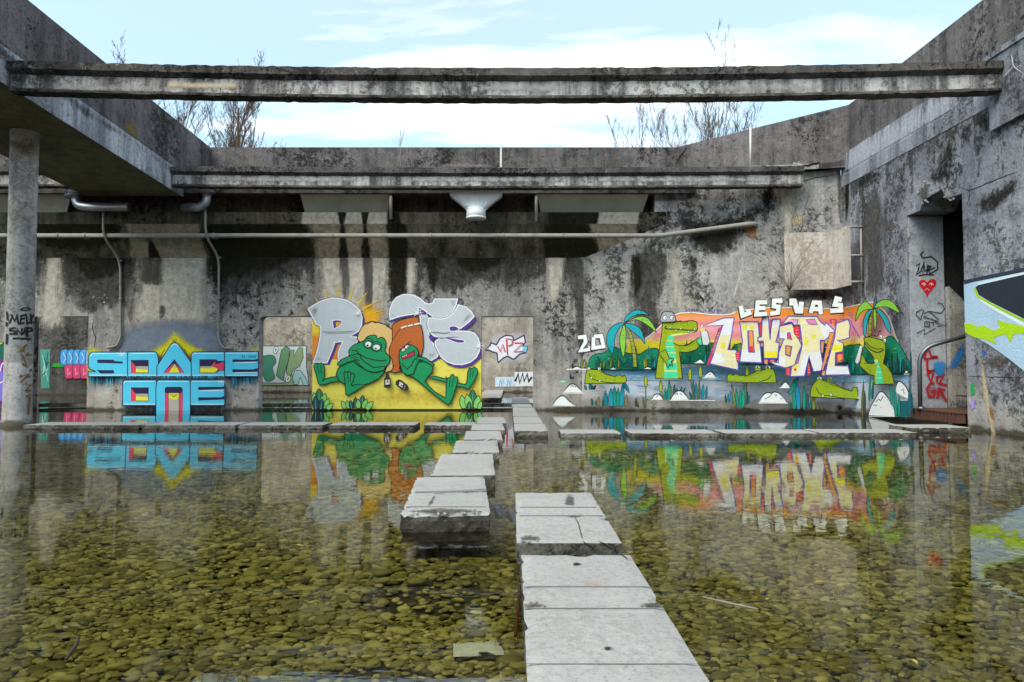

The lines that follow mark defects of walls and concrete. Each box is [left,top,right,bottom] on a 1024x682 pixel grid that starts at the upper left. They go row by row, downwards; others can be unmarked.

leakage [586,212,639,251]
leakage [599,177,802,233]
leakage [838,167,887,294]
leakage [39,212,584,354]
leakage [629,248,700,338]
crack [573,515,627,559]